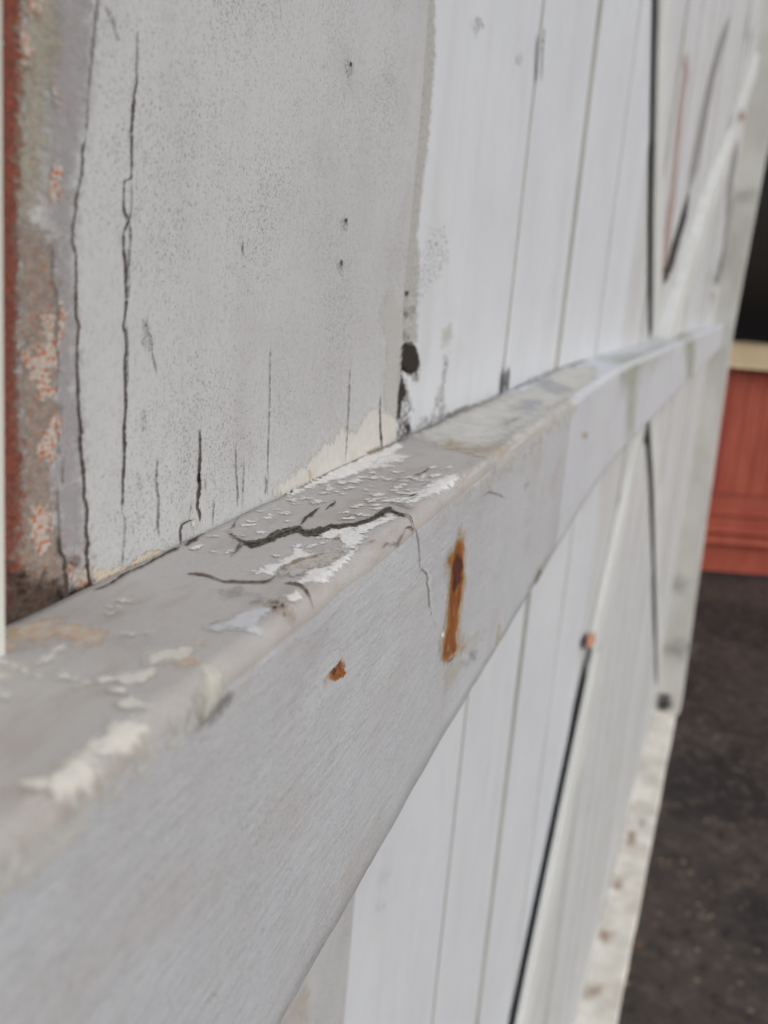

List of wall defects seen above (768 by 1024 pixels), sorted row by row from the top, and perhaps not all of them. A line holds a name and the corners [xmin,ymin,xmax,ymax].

peeling [0,0,198,897]
crack [51,0,157,598]
crack [156,353,433,615]
rust [328,647,347,681]
peeling [206,0,600,635]
rust [440,540,464,661]